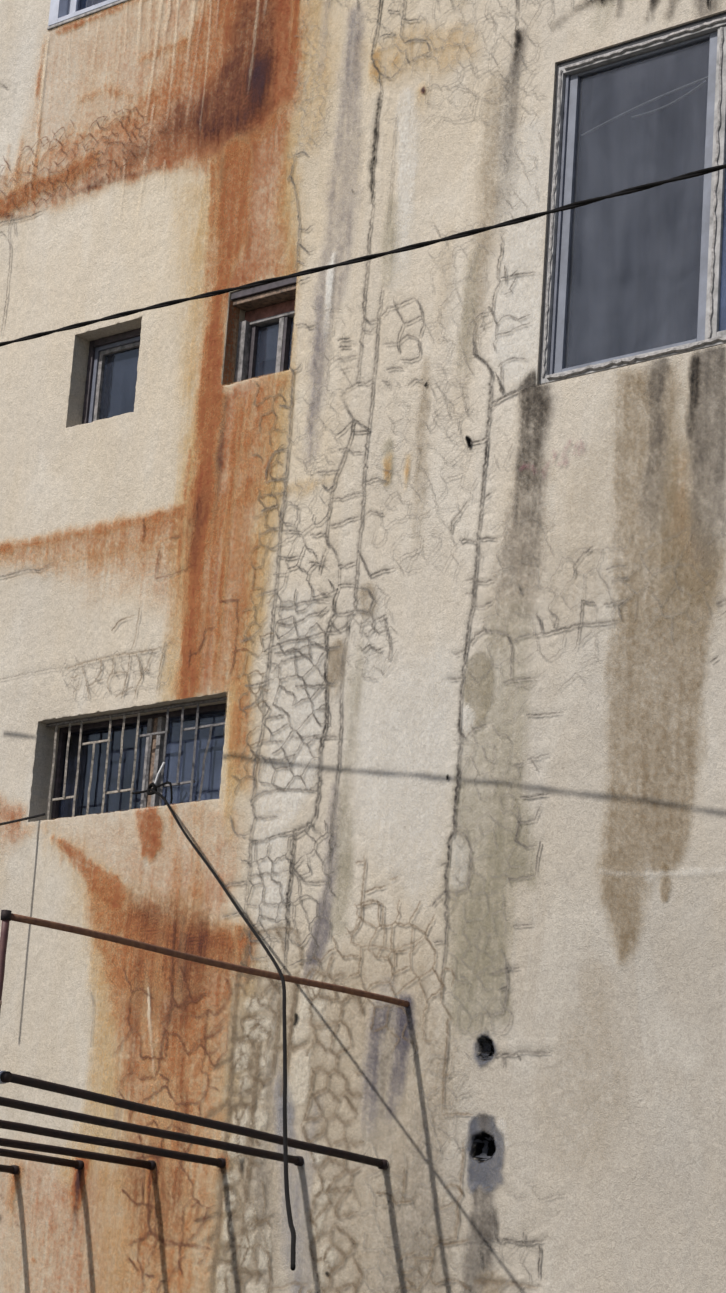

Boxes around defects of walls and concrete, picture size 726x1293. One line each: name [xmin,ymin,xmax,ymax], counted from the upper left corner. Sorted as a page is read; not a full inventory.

corrosion [10,837,252,1293]
corrosion [136,806,162,859]
corrosion [0,0,307,791]
crack [80,0,628,1293]
damp [515,373,549,516]
damp [602,345,725,959]